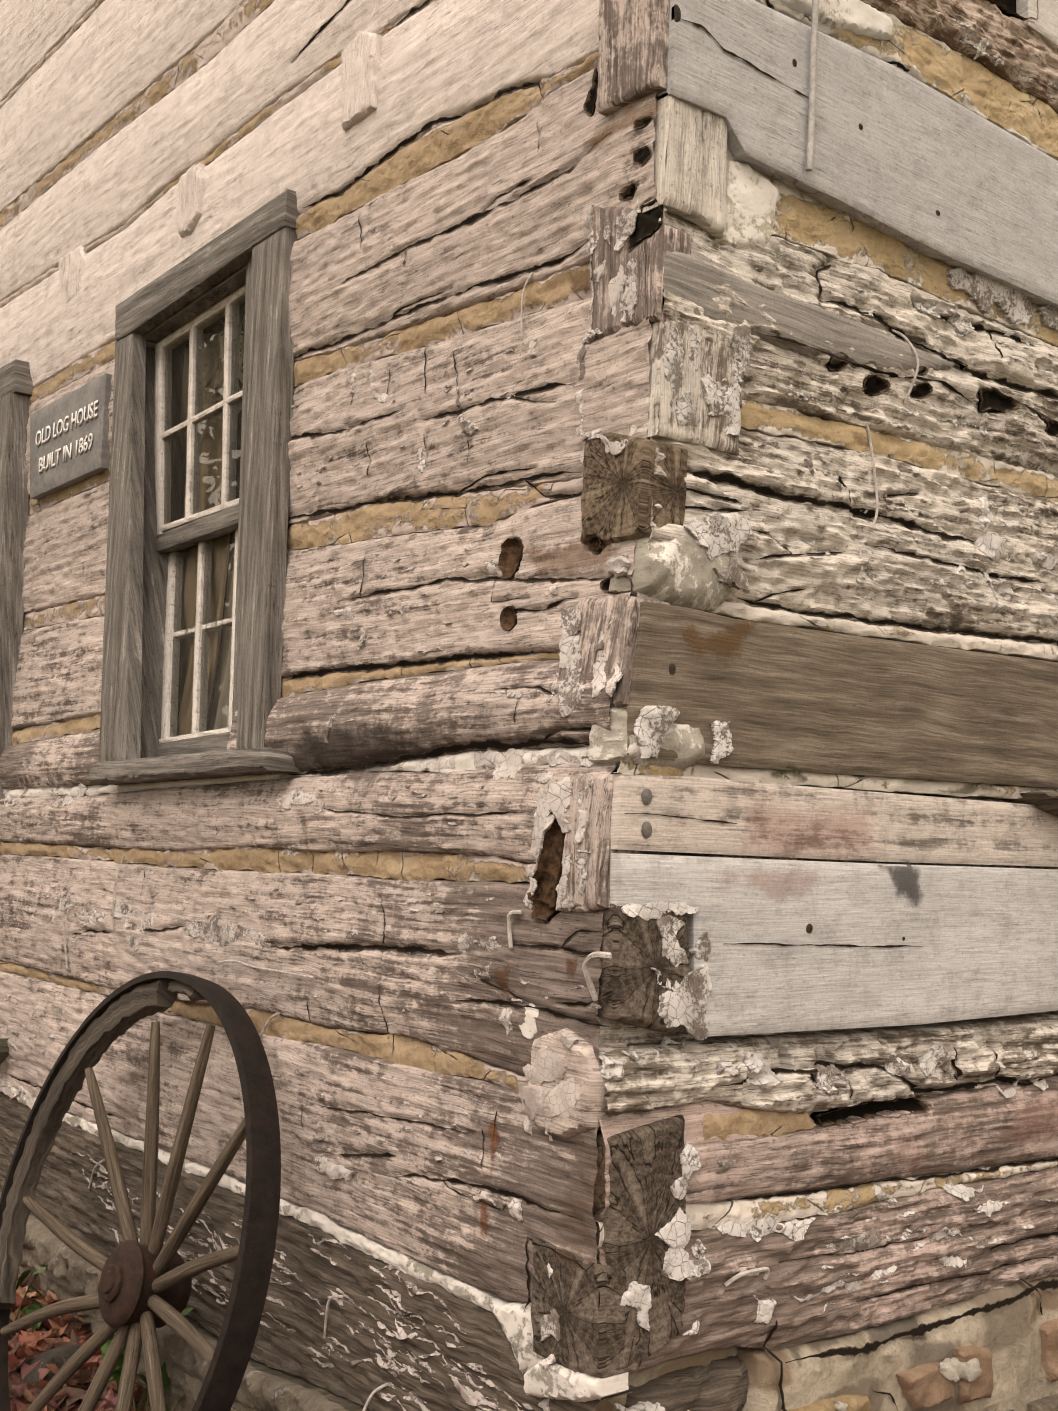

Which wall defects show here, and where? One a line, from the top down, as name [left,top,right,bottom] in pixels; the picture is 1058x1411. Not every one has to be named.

crack [292,0,350,63]
crack [381,0,430,34]
crack [330,132,612,291]
crack [288,468,581,519]
peeling [684,512,752,591]
peeling [473,747,596,912]
peeling [599,901,712,1080]
crack [721,1048,1058,1098]
peeling [71,1152,243,1305]
peeling [655,1142,736,1281]
peeling [620,1281,652,1332]
crack [763,1232,1058,1411]